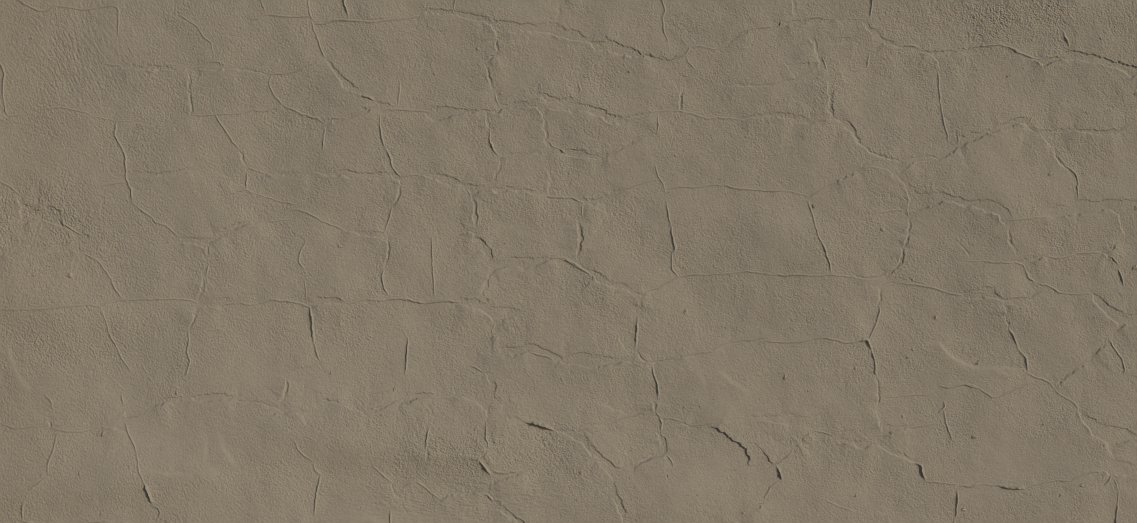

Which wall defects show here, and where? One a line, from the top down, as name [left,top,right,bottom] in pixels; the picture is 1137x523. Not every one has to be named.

crack [0,62,26,124]
crack [19,393,58,518]
crack [98,307,143,479]
crack [97,115,321,404]
crack [250,0,753,523]
crack [652,0,1137,523]